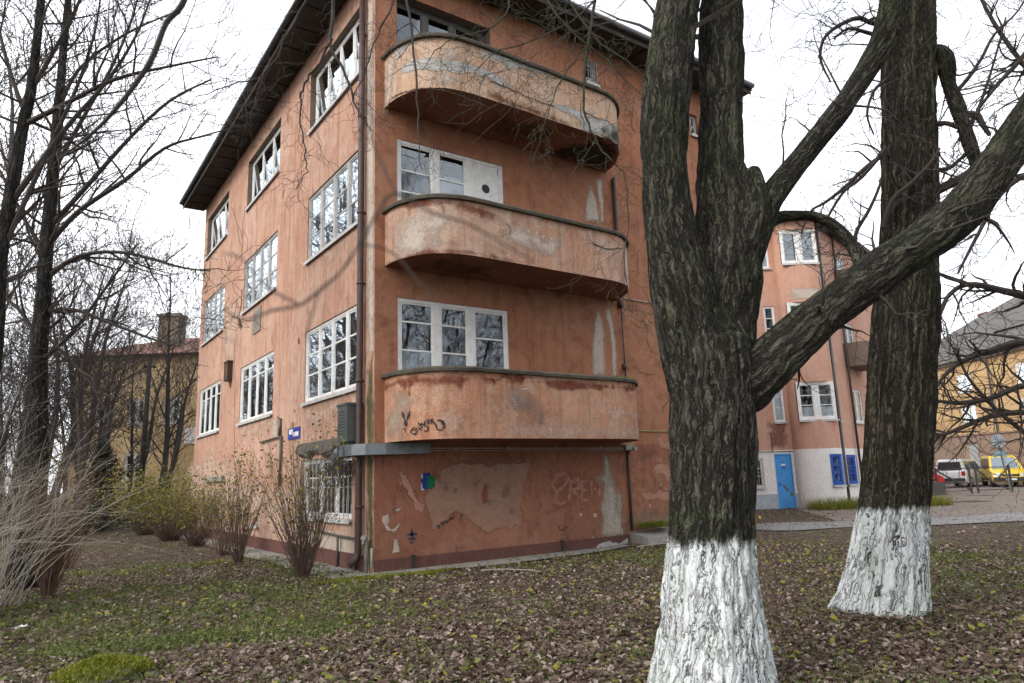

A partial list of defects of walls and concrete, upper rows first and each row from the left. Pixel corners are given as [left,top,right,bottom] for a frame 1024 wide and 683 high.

flaking render [394,42,551,88]
spalling [556,104,619,146]
peeling [382,456,530,553]